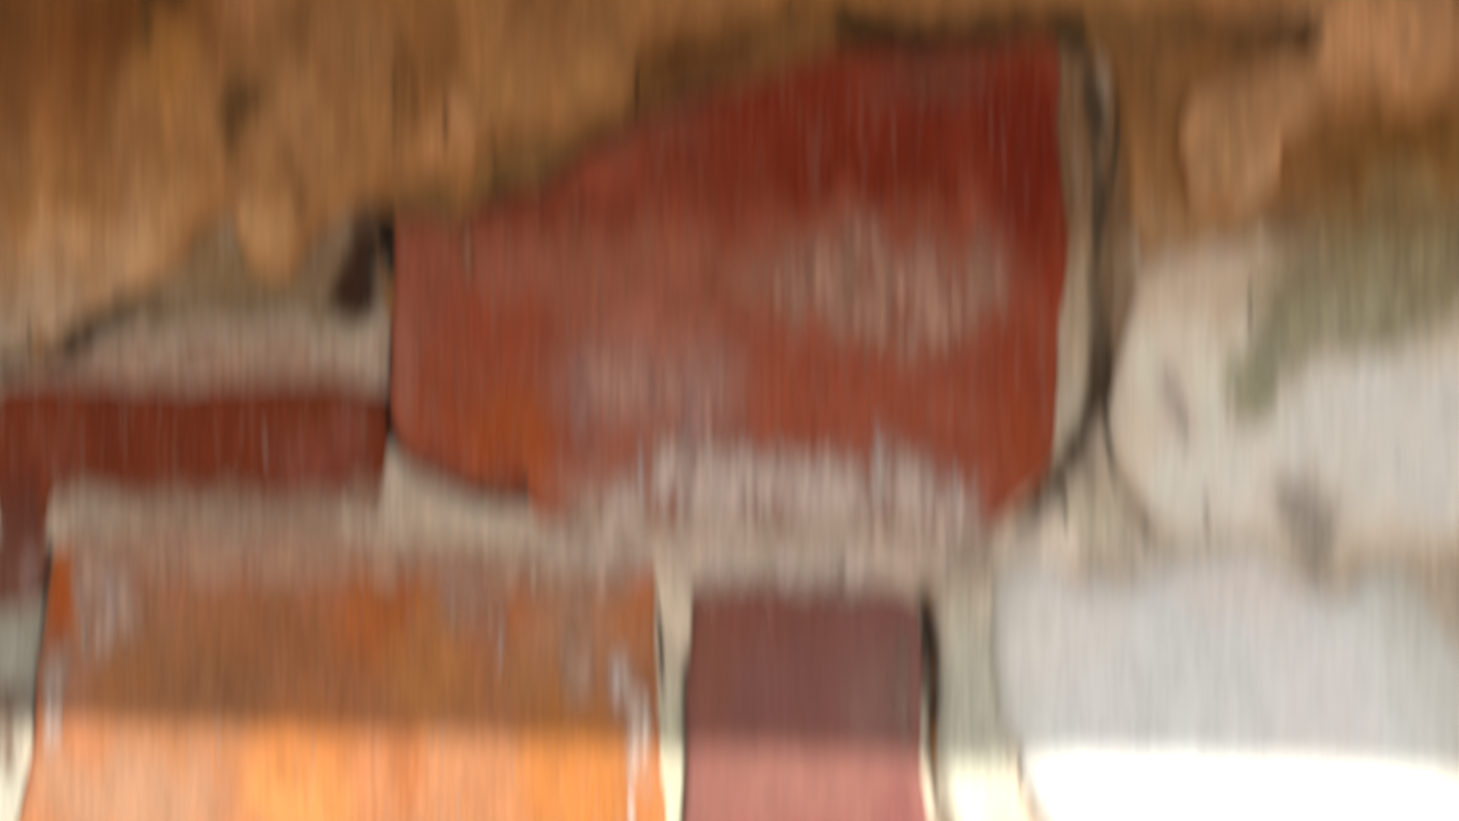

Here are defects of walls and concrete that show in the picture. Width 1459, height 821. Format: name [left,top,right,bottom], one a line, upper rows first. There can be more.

spalling [328,210,395,321]